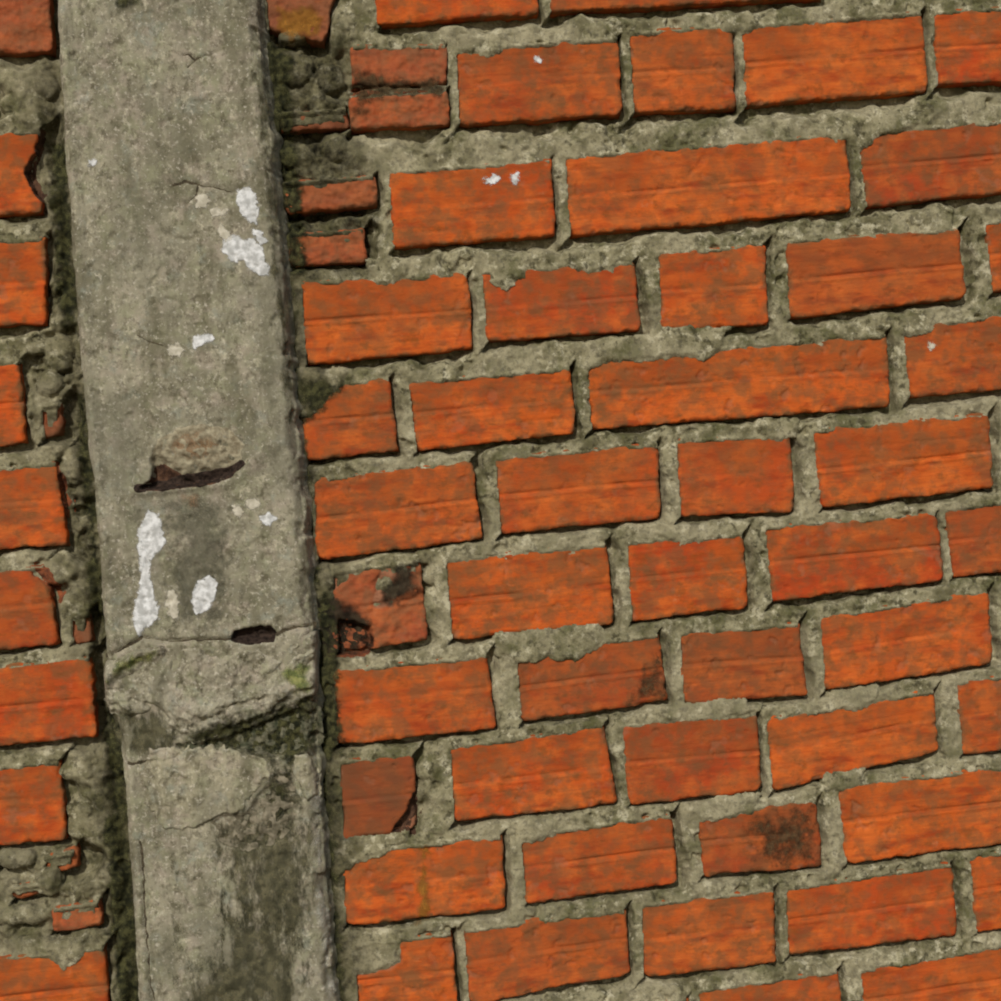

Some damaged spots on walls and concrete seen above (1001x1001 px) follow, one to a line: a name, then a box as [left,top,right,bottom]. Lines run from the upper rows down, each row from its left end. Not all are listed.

spalling [134,424,249,493]
crack [106,622,316,657]
spalling [333,619,374,658]